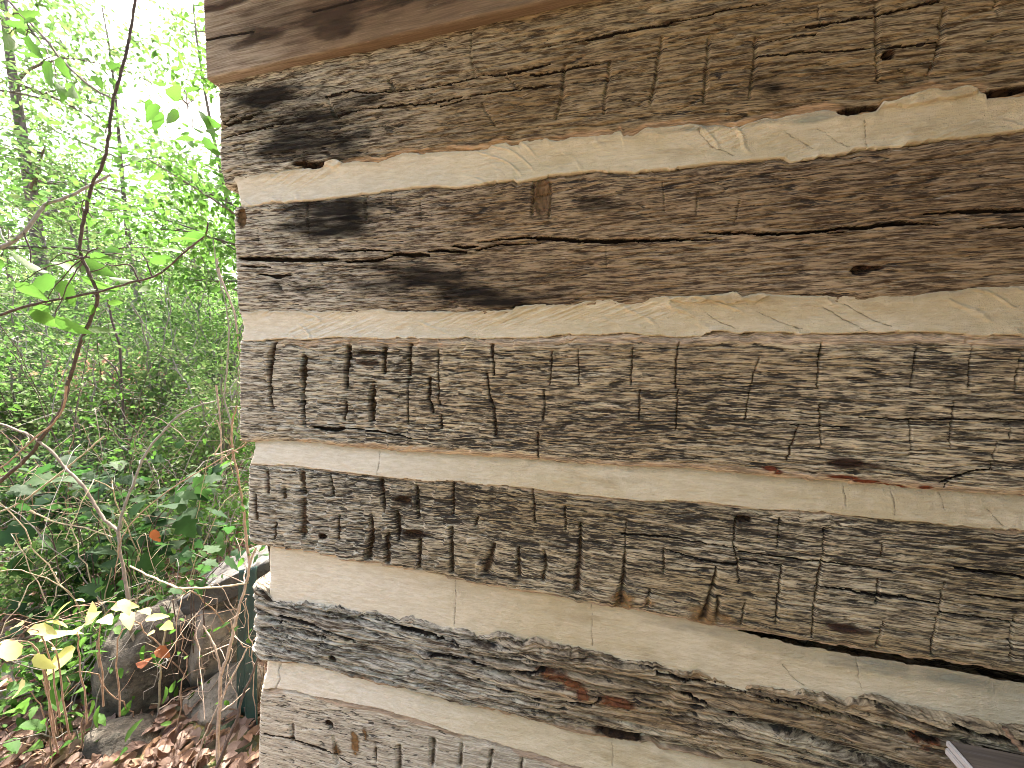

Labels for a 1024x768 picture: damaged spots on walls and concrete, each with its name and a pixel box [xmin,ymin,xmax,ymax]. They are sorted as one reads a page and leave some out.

damp [238,84,297,111]
damp [257,111,367,160]
damp [284,197,385,236]
crack [240,209,1024,279]
damp [378,265,526,308]